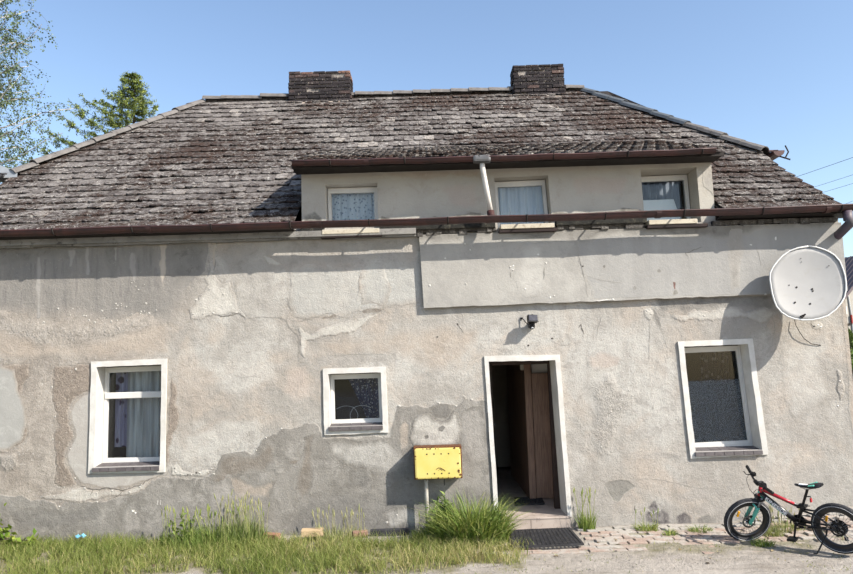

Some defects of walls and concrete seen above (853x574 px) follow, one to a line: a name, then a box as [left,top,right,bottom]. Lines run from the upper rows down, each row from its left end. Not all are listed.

peeling [189,244,246,322]
flaking render [0,302,159,345]
peeling [298,314,379,358]
peeling [0,358,32,396]
peeling [40,362,152,503]
peeling [409,411,463,446]
peeling [383,507,419,528]